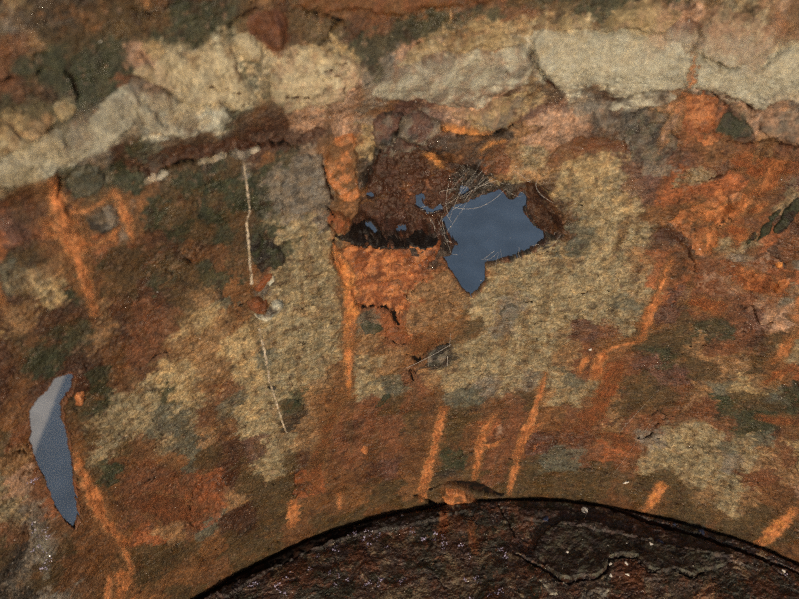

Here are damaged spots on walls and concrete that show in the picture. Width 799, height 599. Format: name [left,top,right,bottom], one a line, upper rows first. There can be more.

crack [64,70,79,100]
peeling [0,32,329,187]
crack [229,2,259,29]
peeling [270,44,362,113]
crack [297,5,342,42]
peeling [372,0,799,169]
corrosion [40,176,135,316]
spalling [333,146,464,344]
corrosion [472,372,547,491]
corrosion [73,454,136,599]
crack [413,480,704,585]
corrosion [754,506,798,546]